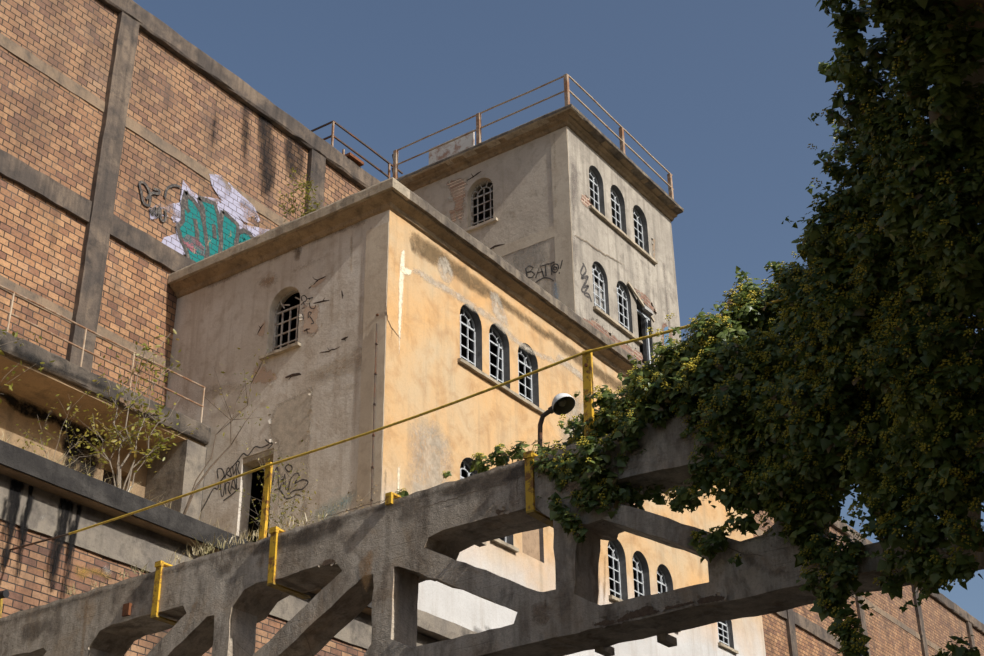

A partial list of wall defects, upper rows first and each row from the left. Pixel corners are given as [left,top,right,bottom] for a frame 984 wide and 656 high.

leakage [286,139,304,177]
flaking render [299,300,323,334]
leakage [2,480,34,574]
leakage [41,499,86,630]